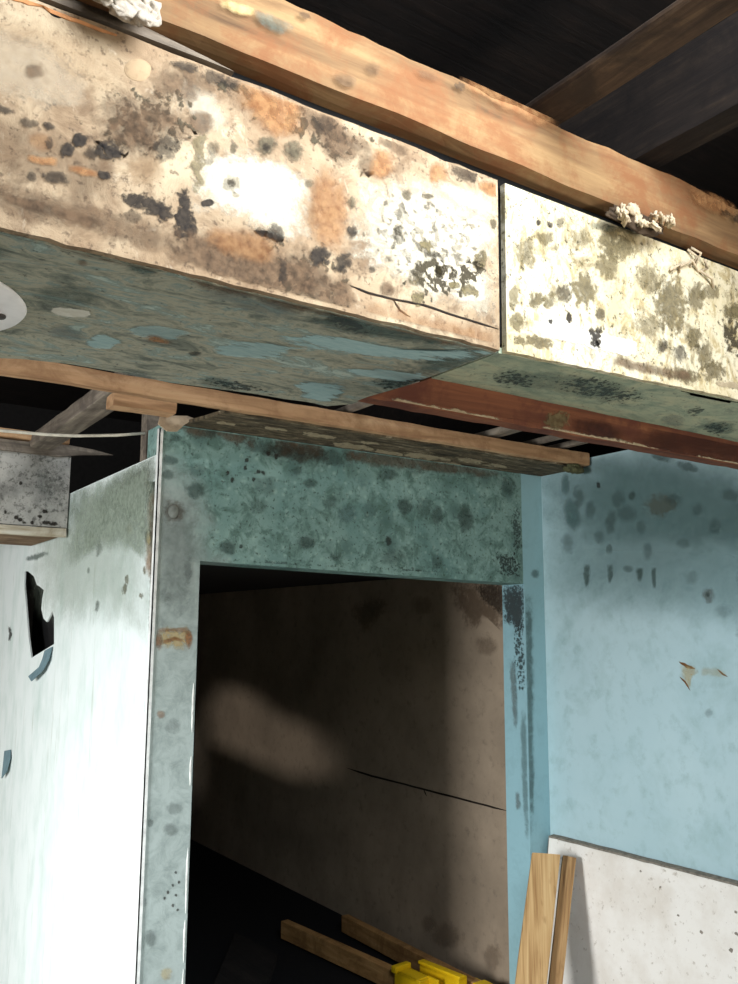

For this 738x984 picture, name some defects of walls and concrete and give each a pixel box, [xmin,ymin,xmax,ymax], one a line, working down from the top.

leakage [28,172,67,183]
leakage [43,61,492,371]
leakage [517,218,563,271]
leakage [530,225,634,349]
peeling [52,308,90,317]
crack [350,285,498,329]
leakage [653,272,738,385]
peeling [215,335,491,361]
peeling [295,382,343,401]
peeling [347,369,426,381]
rust [156,630,192,647]
peeling [28,647,53,681]